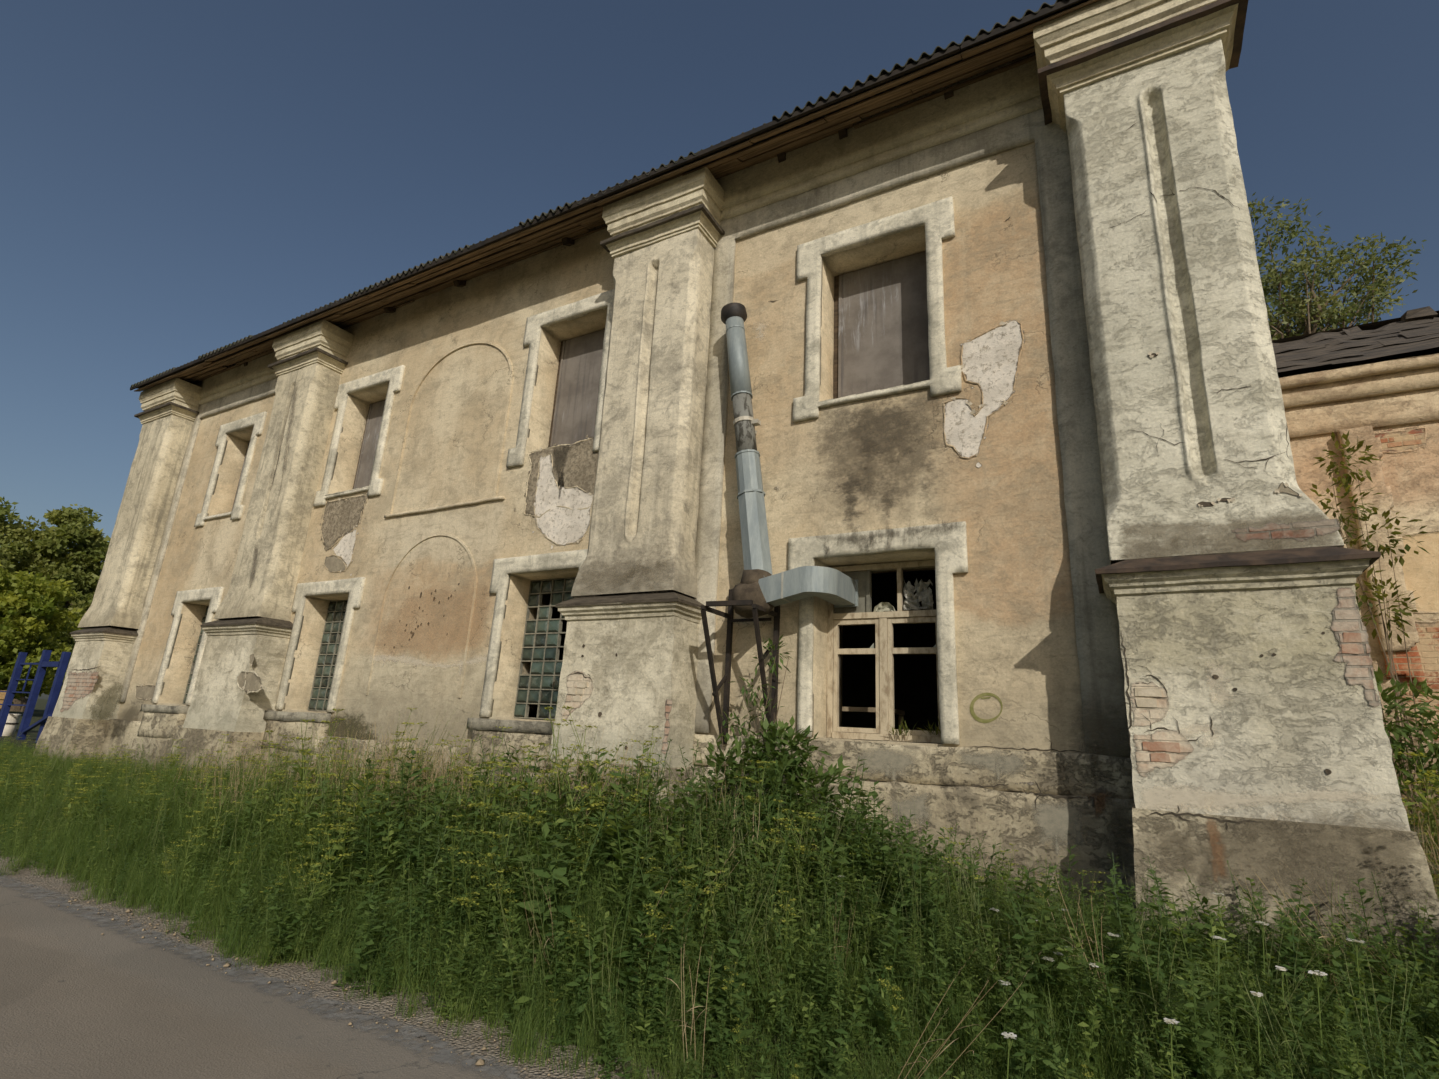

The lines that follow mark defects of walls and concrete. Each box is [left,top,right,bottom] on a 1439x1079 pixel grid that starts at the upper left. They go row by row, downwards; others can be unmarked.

flaking render [943,320,1025,468]
flaking render [320,493,368,576]
flaking render [514,434,599,549]
flaking render [1322,530,1439,744]
flaking render [1130,681,1194,777]